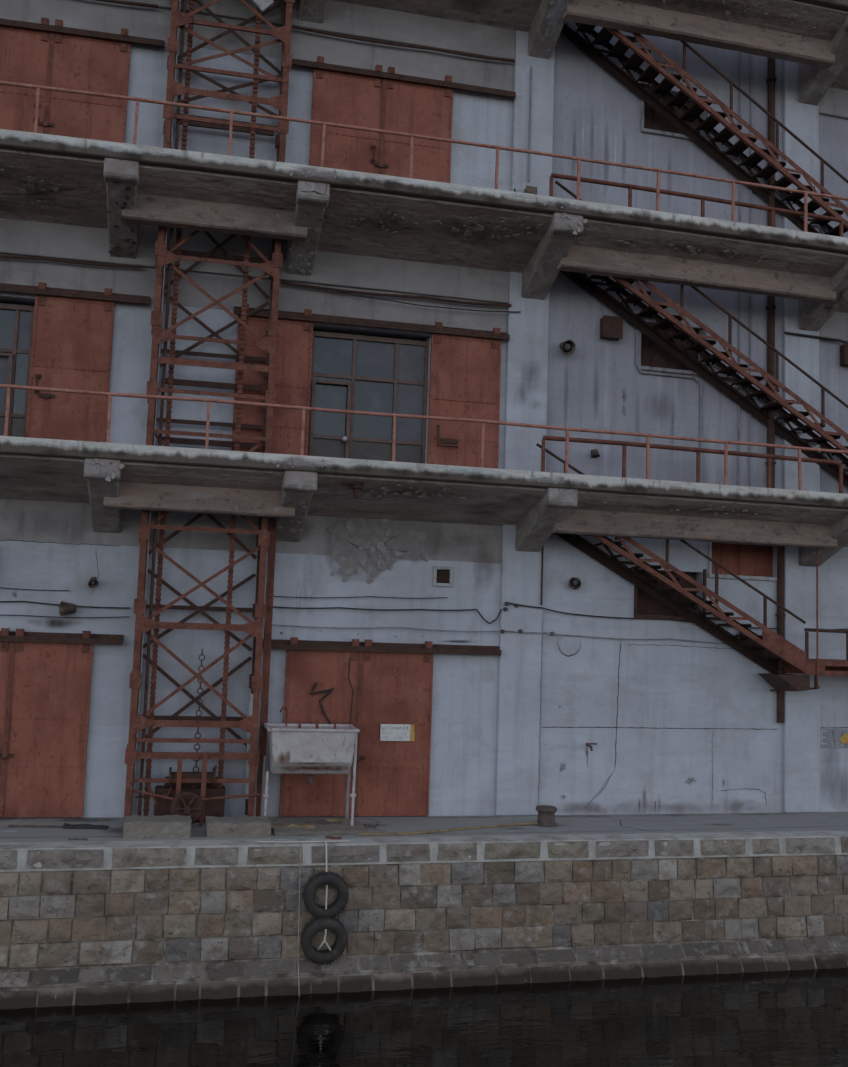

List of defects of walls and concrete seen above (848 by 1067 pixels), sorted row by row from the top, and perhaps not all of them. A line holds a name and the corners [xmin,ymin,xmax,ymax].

peeling [327,517,437,584]
crack [538,623,777,832]